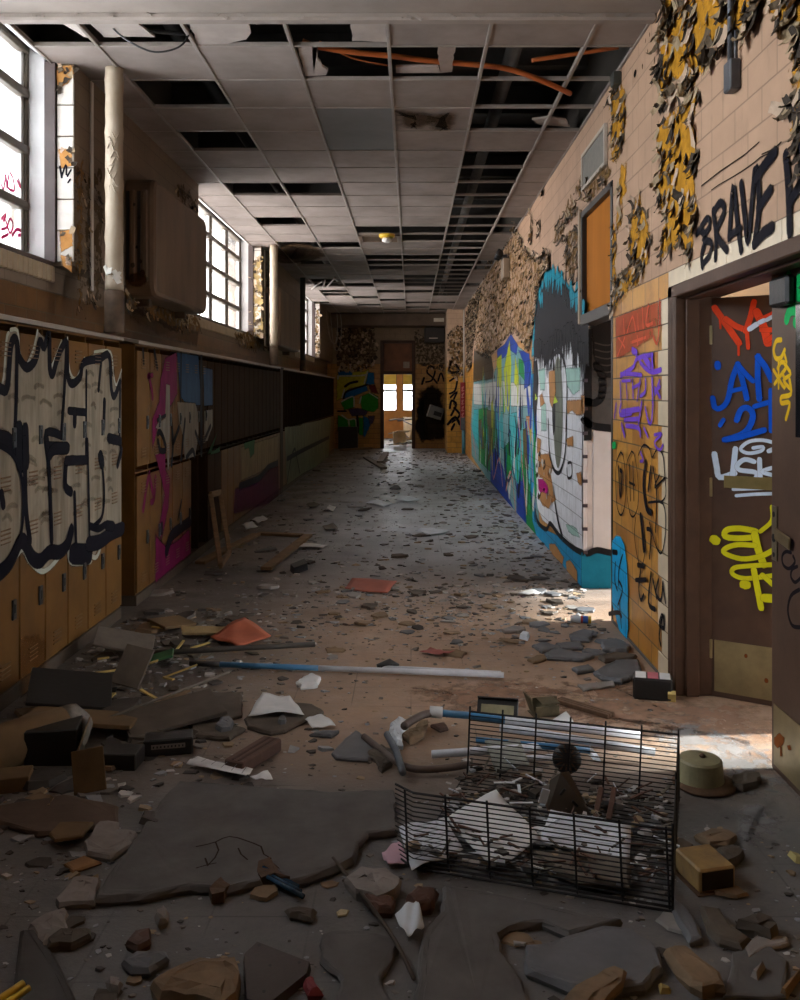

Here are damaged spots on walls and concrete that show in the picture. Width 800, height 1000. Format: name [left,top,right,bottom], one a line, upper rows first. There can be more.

spalling [64,12,155,38]
spalling [190,13,251,44]
spalling [350,24,387,42]
spalling [298,47,328,76]
spalling [396,47,456,73]
peeling [54,63,80,94]
peeling [175,184,198,213]
peeling [414,0,800,381]
peeling [58,146,105,319]
crack [196,836,272,868]